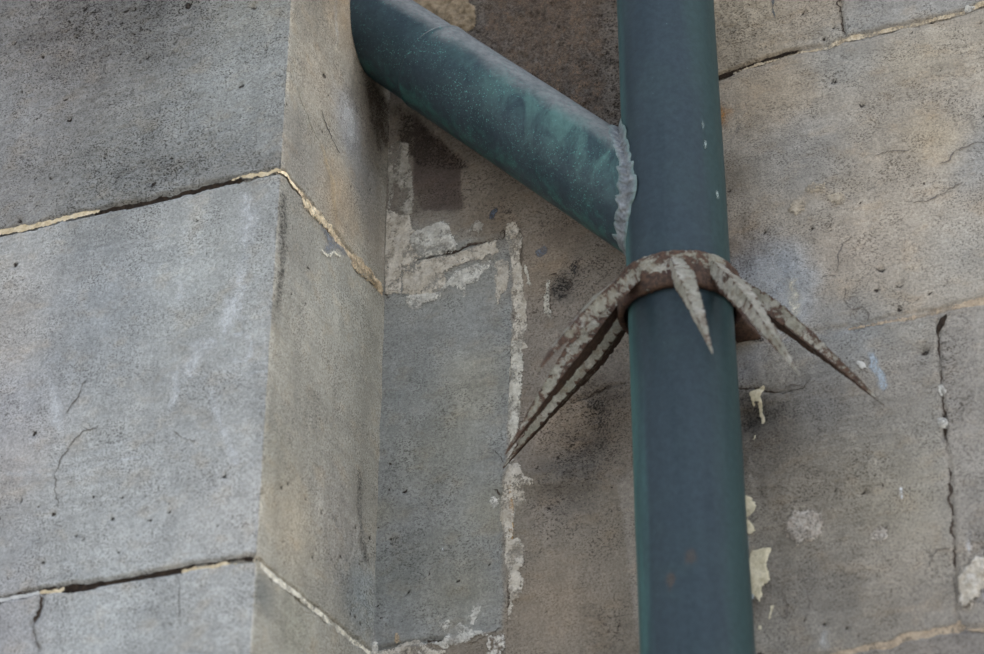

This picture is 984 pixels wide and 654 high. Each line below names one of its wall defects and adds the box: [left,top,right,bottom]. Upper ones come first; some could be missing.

flaking render [302,142,511,310]
spalling [543,261,579,317]
crack [936,314,948,442]
crack [54,425,99,506]
flaking render [483,340,538,619]
peeling [745,495,757,534]
crack [929,467,956,569]
peeling [749,547,771,602]